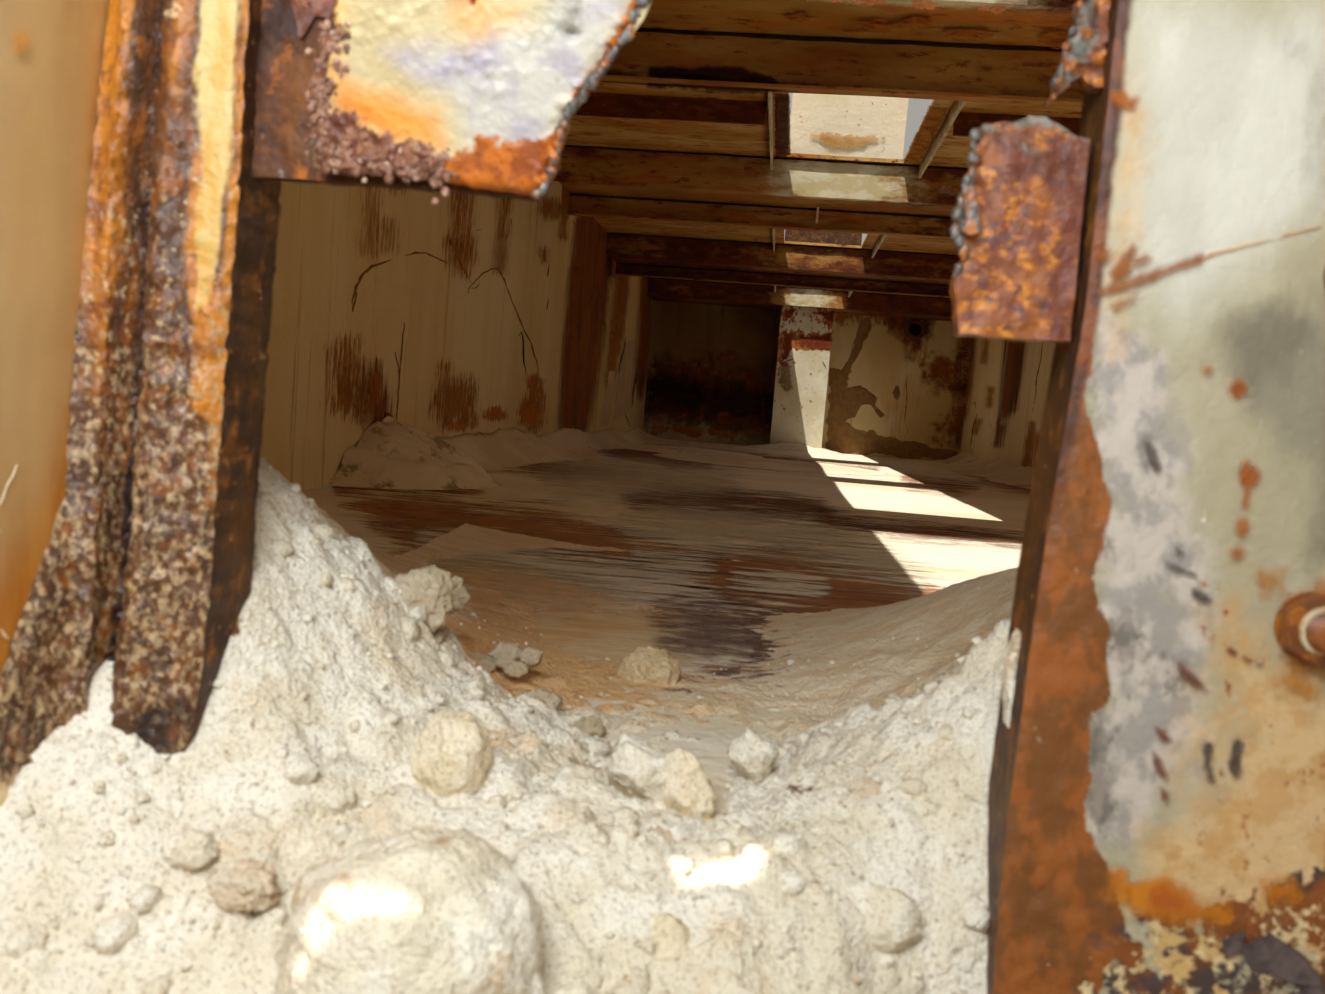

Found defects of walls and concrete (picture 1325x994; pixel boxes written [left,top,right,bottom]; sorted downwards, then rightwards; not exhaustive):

rust [298,20,476,279]
rust [647,66,791,157]
rust [904,107,946,164]
rust [430,197,653,432]
peeling [825,319,958,460]
rust [782,309,1025,447]
spalling [1146,443,1161,471]
rust [332,443,1030,674]
spalling [1178,662,1204,688]
spalling [1153,727,1171,800]
spalling [1203,742,1215,783]
spalling [1228,739,1244,777]